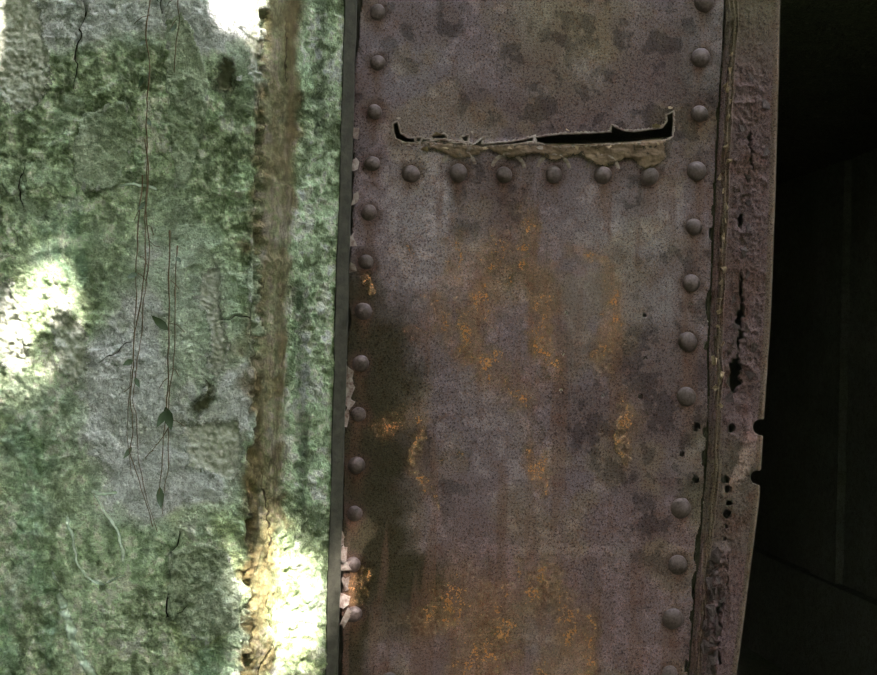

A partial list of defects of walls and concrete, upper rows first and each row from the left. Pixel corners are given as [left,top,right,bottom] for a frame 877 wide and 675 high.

crack [73,1,87,89]
corrosion [454,215,560,409]
peeling [345,381,355,427]
corrosion [382,413,440,507]
damp [66,517,125,585]
damp [92,491,125,562]
peeling [341,531,351,571]
damp [56,593,97,675]
peeling [339,593,351,628]
corrosion [420,563,597,675]